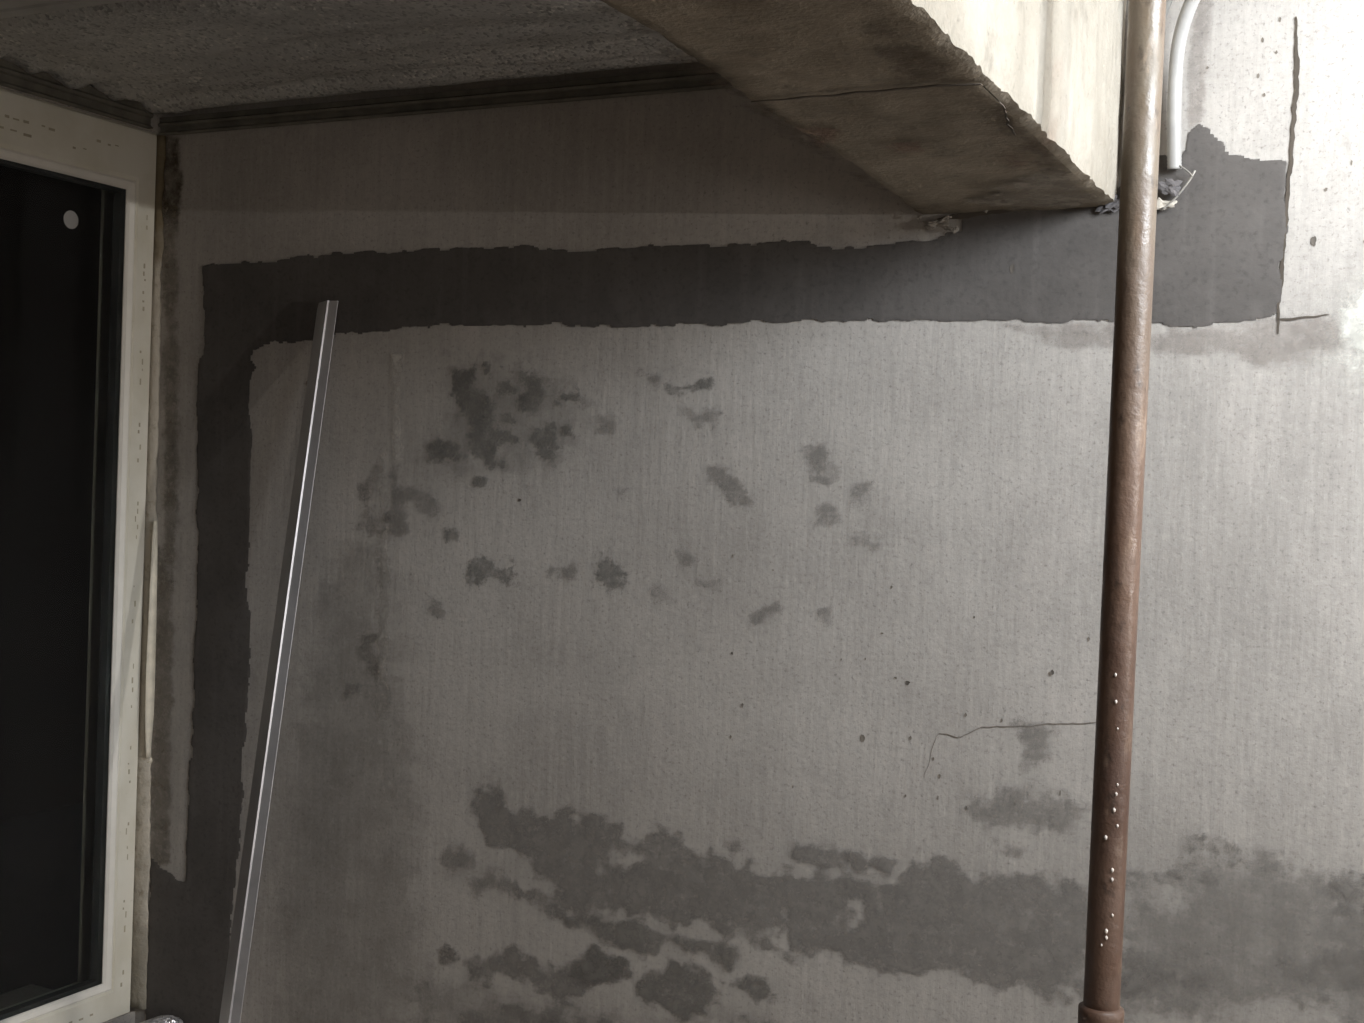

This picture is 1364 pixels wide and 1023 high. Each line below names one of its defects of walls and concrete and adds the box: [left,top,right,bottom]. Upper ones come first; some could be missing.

damp [430,363,575,486]
damp [655,376,712,391]
damp [1338,291,1364,370]
damp [151,212,178,864]
crack [924,722,1095,778]
damp [439,788,1088,1022]